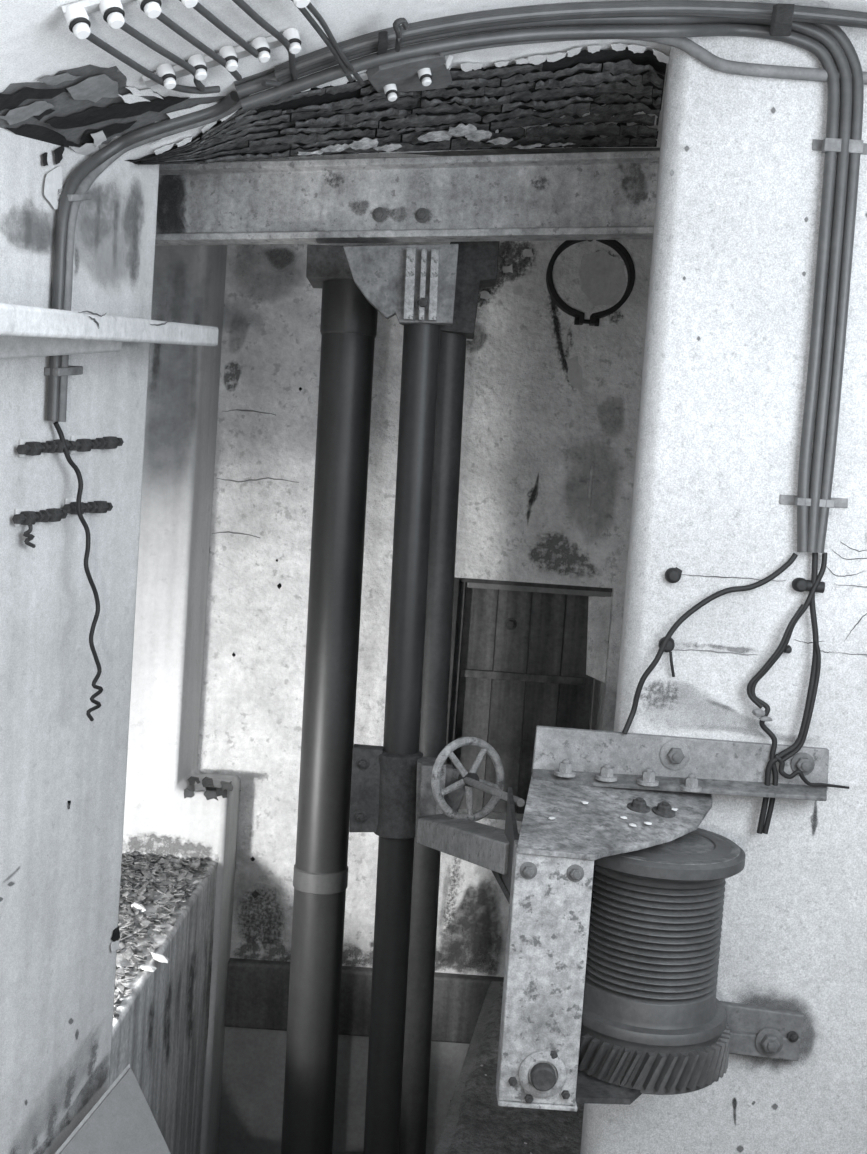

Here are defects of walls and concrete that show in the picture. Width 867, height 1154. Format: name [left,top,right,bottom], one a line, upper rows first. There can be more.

spalling [0,65,226,209]
spalling [125,43,669,165]
water stain [9,210,51,251]
water stain [85,188,143,267]
water stain [531,534,595,576]
crack [681,573,775,581]
crack [796,542,867,655]
water stain [242,890,281,943]
water stain [750,999,800,1011]
water stain [32,1045,108,1153]